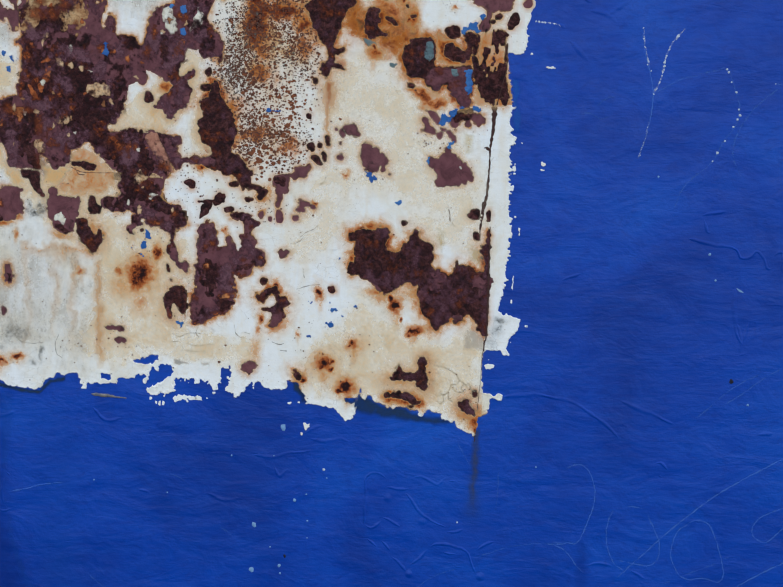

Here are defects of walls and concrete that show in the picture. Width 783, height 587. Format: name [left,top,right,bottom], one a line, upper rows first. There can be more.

corrosion [0,0,520,363]
peeling [0,0,526,436]
corrosion [289,208,494,433]
crack [429,43,508,442]
peeling [408,0,555,68]